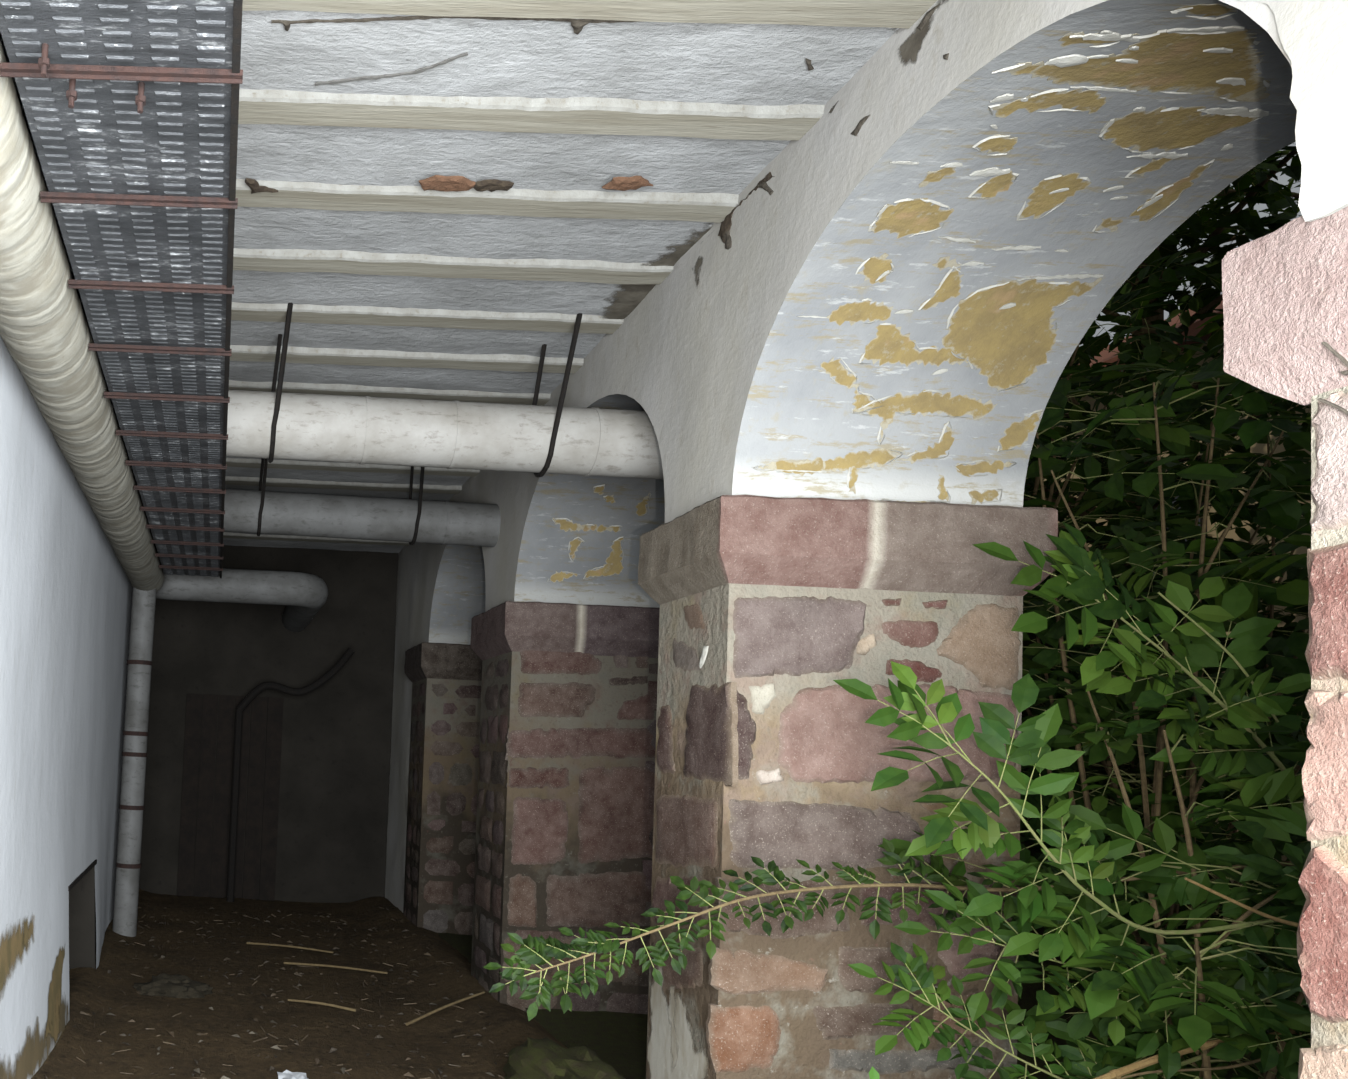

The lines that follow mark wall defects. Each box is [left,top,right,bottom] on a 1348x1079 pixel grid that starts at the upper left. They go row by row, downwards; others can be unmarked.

peeling [752,0,1270,505]
peeling [547,518,624,583]